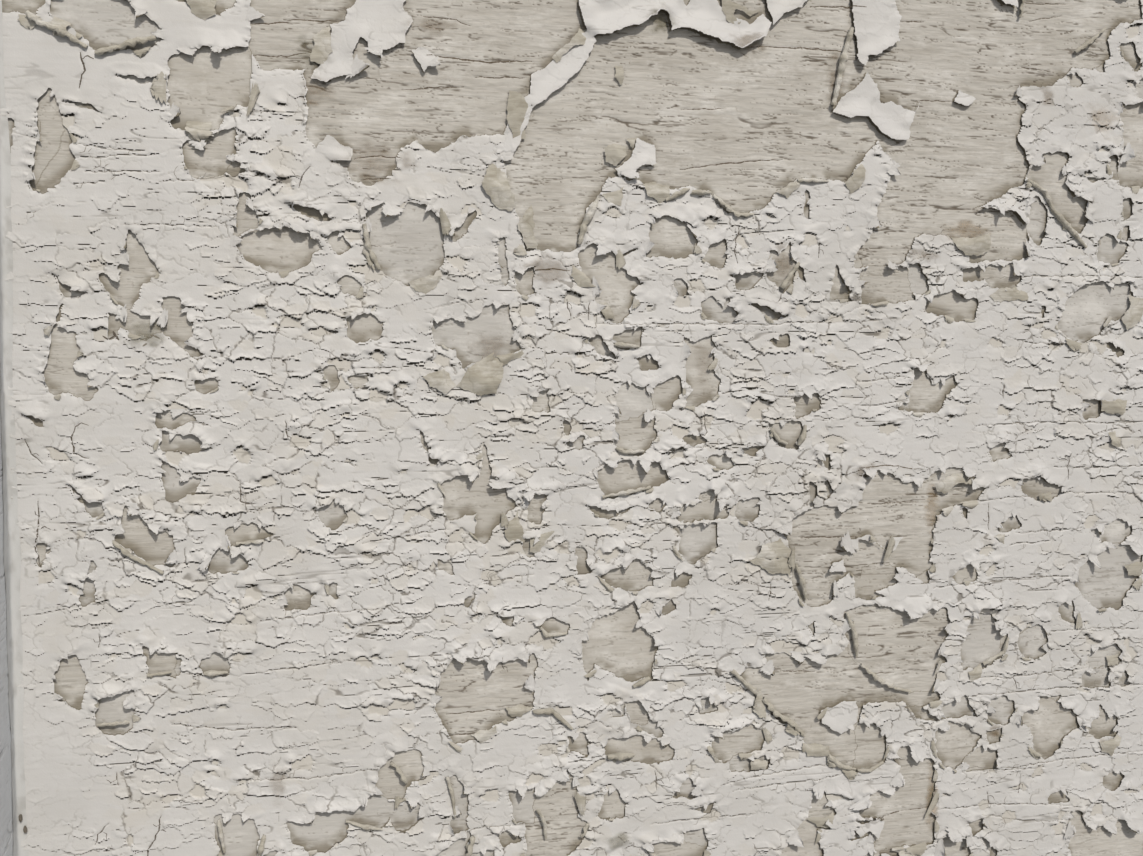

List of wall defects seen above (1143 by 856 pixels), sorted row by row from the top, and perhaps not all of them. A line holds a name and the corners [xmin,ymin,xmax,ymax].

crack [75,143,259,187]
peeling [115,0,1143,371]
crack [680,159,783,170]
peeling [36,229,206,401]
crack [70,423,89,459]
crack [35,507,51,567]
peeling [429,334,761,764]
crack [981,453,1141,551]
peeling [706,450,1143,856]
peeling [213,747,430,856]
peeling [436,766,629,856]
crack [873,751,1136,827]